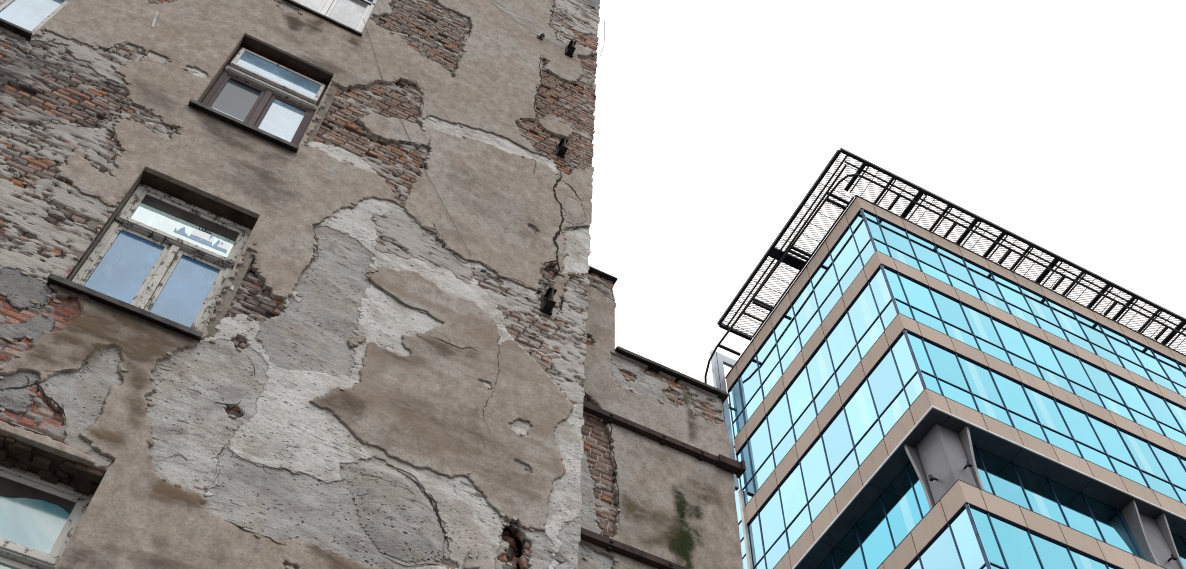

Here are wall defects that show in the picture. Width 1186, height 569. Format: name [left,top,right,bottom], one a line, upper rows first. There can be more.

peeling [0,30,177,475]
peeling [144,0,621,569]
crack [413,0,589,310]
peeling [611,354,724,424]
leakage [623,490,713,555]